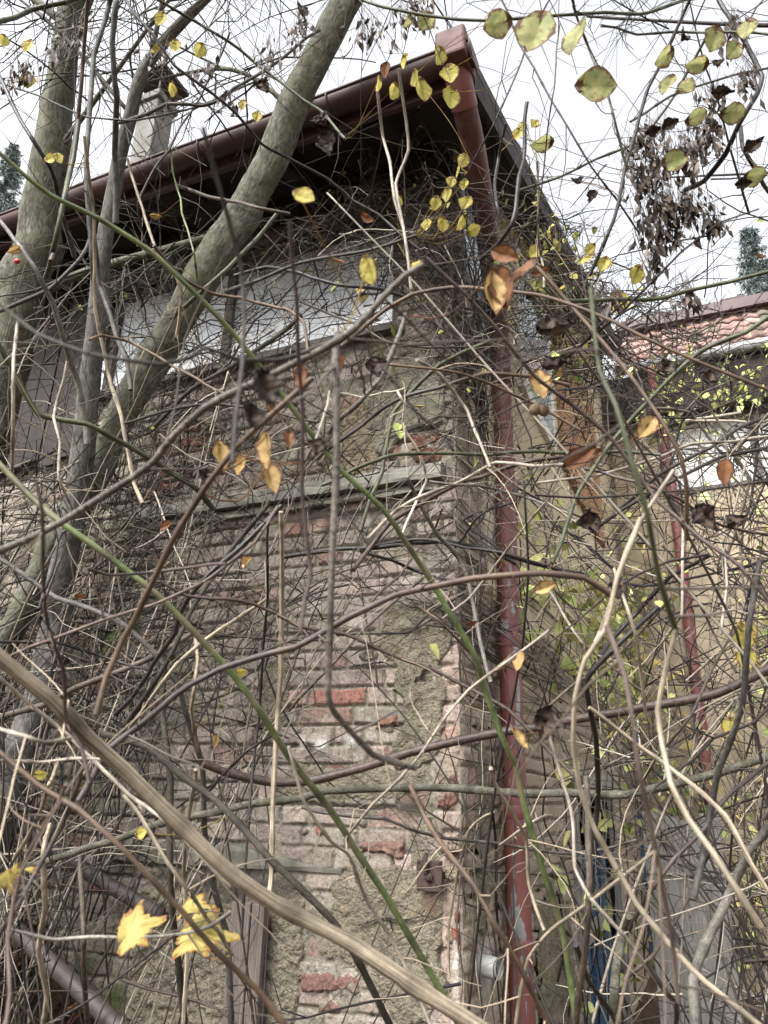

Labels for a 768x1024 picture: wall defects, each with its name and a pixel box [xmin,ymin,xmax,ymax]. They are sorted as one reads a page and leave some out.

peeling [276,597,472,810]
peeling [264,912,434,1024]
peeling [273,824,461,996]
peeling [469,719,492,938]